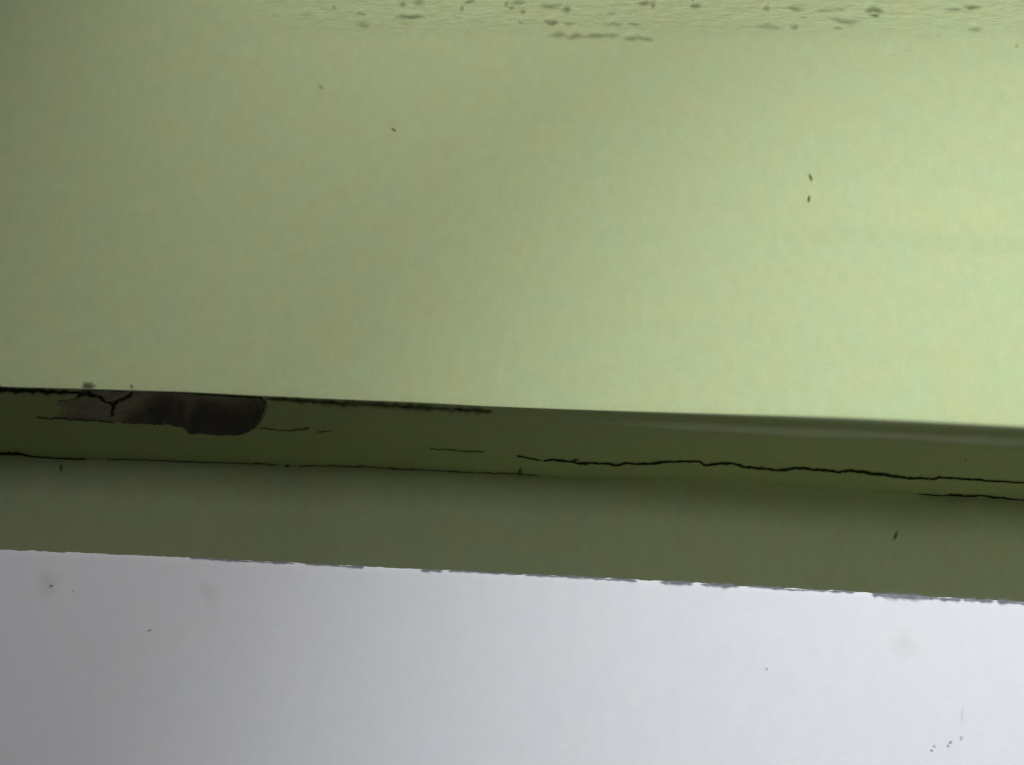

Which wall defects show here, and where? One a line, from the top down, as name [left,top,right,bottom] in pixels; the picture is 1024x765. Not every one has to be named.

spalling [59,382,265,436]
crack [0,448,1024,501]